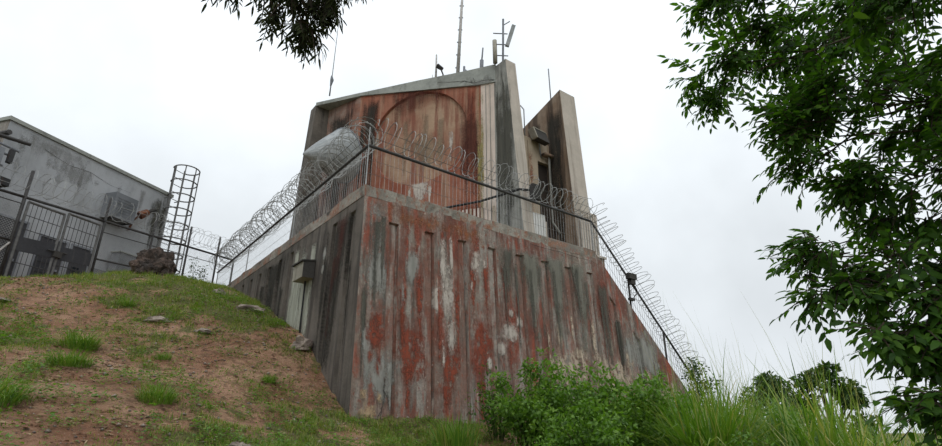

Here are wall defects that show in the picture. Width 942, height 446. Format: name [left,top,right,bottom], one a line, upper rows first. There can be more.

rust [394,91,437,132]
rust [460,97,478,180]
rust [366,314,385,374]
rust [390,206,489,408]
rust [438,267,493,421]